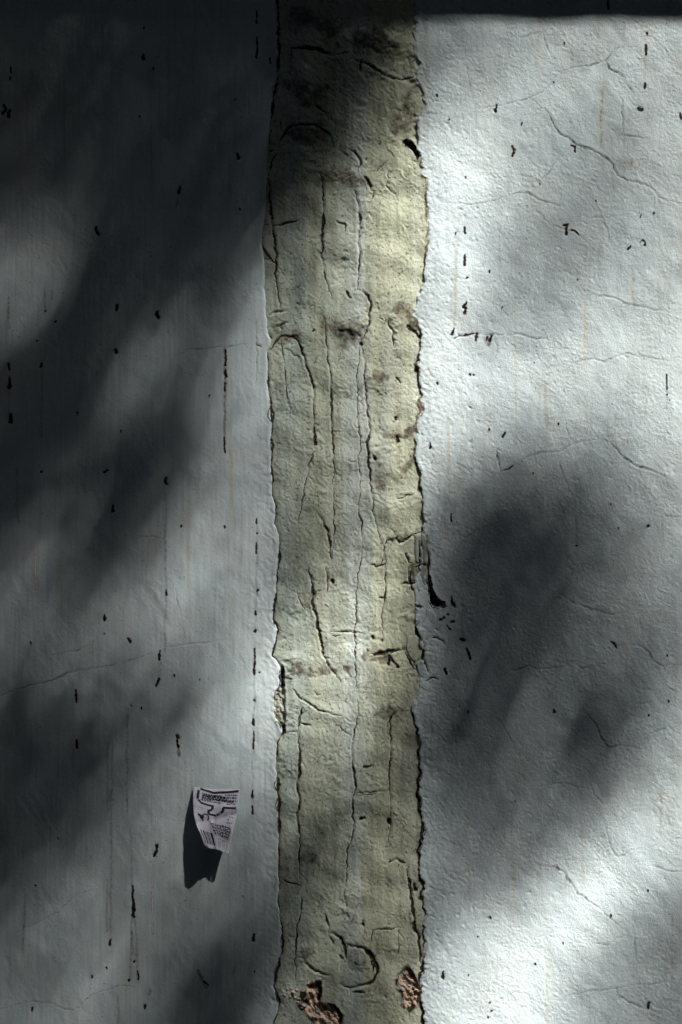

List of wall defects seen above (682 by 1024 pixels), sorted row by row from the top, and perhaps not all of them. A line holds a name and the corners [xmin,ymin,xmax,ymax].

spalling [402,139,420,160]
crack [540,106,663,199]
crack [256,0,444,1024]
peeling [413,533,446,609]
spalling [273,667,287,735]
spalling [282,979,345,1024]
spalling [395,963,423,1012]